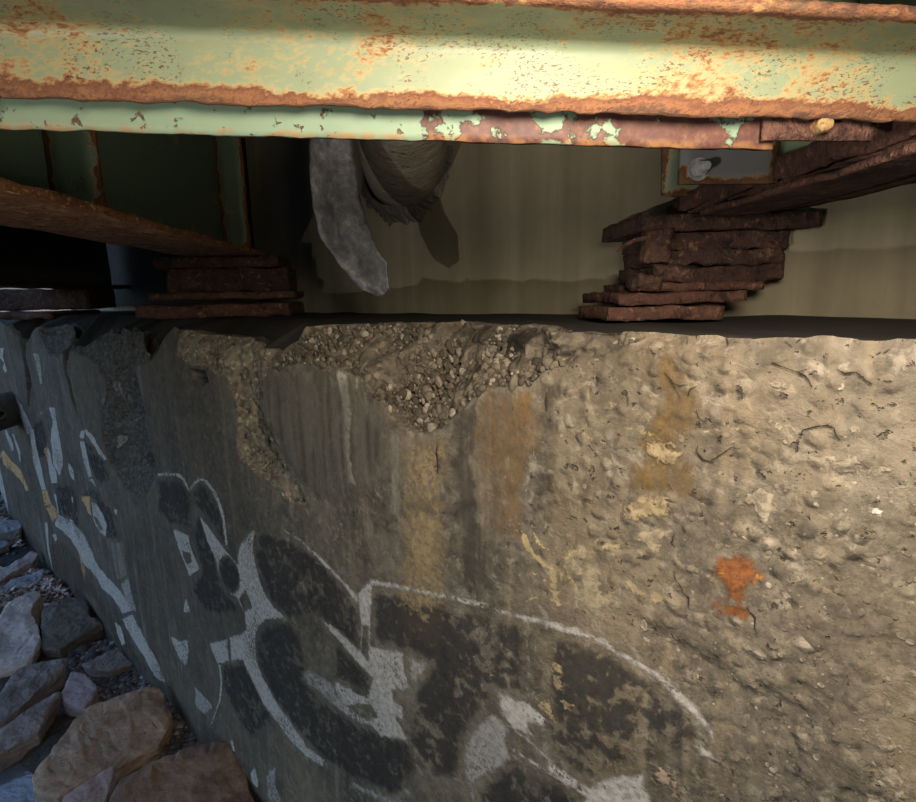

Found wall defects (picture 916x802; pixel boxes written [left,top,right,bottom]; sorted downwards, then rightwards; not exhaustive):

spalling [177,319,646,506]
crack [800,424,841,440]
corrosion [714,556,763,618]